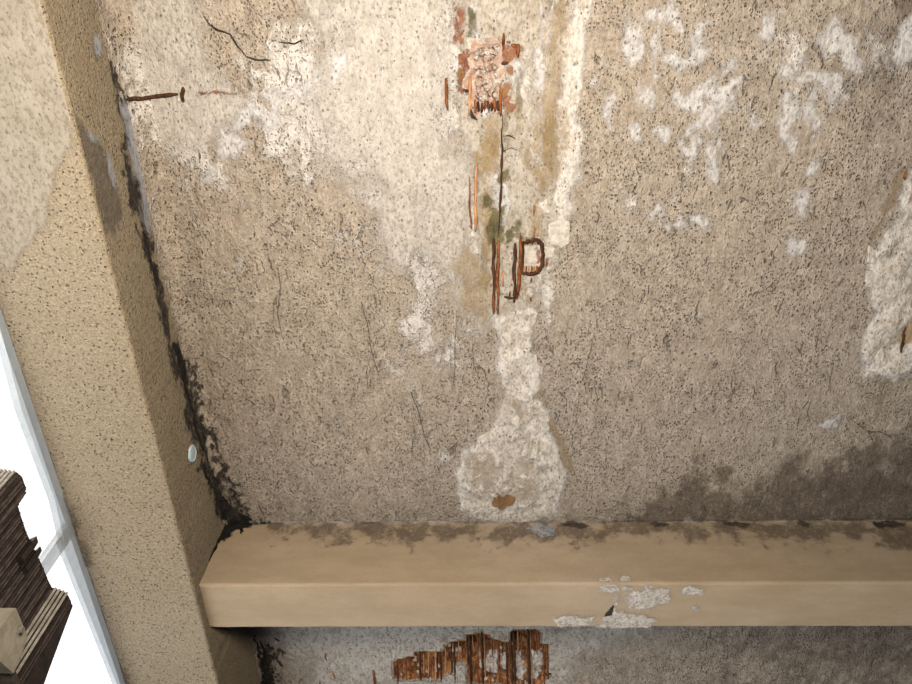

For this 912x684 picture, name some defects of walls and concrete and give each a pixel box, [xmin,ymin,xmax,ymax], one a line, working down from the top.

crack [203,15,303,61]
spalling [453,7,521,120]
corrosion [468,164,478,232]
leakage [108,61,251,523]
leakage [308,0,592,528]
corrosion [491,235,522,315]
leakage [873,520,905,528]
peeling [554,575,671,628]
leakage [258,626,653,684]
spalling [393,629,551,684]